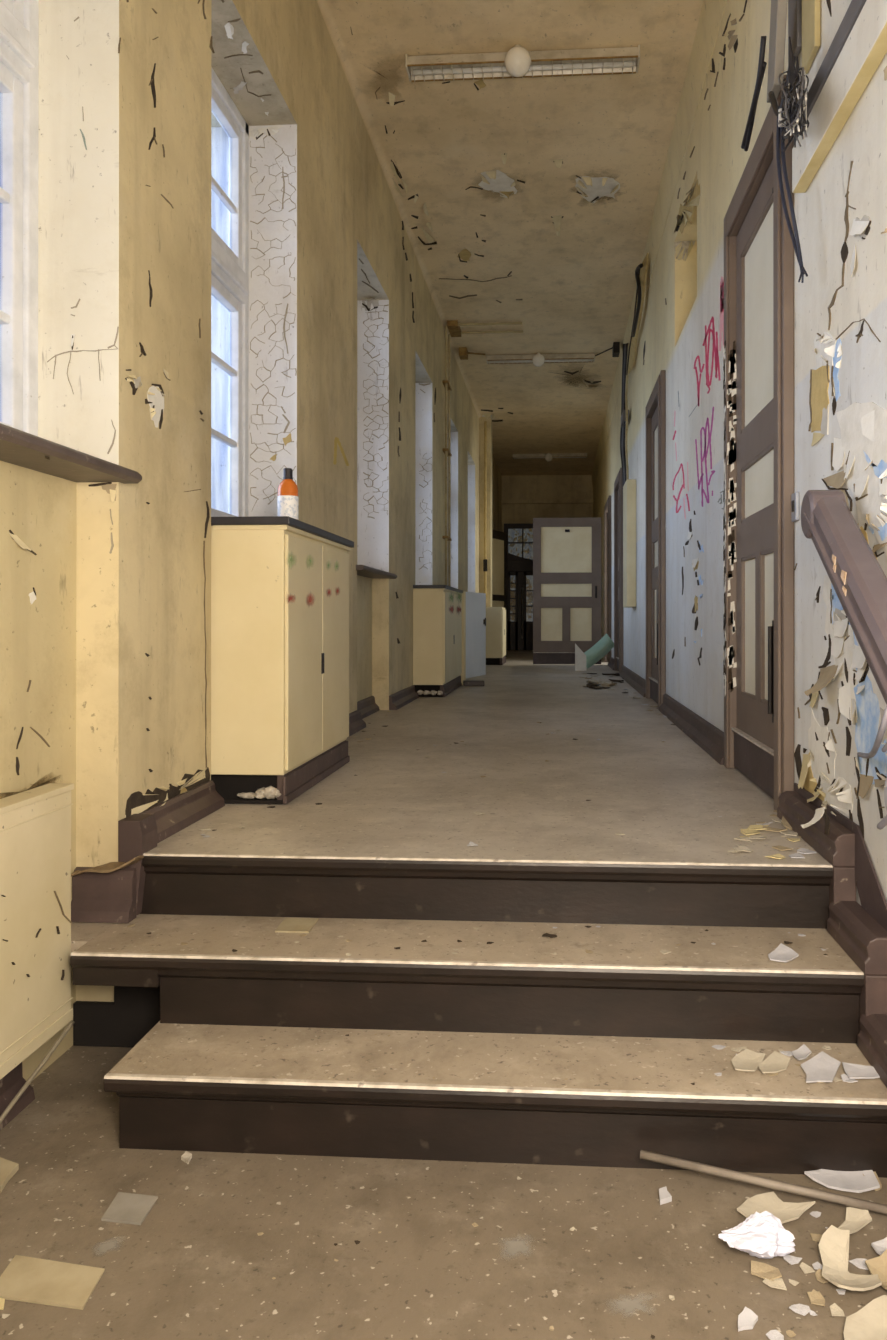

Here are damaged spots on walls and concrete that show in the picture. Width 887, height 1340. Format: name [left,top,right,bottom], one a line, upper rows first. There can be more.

crack [118,0,165,157]
peeling [704,0,747,100]
crack [146,270,154,307]
crack [439,271,522,303]
spalling [674,180,700,261]
crack [828,161,881,343]
crack [47,327,146,394]
peeling [125,369,170,429]
peeling [808,332,887,559]
peeling [685,511,704,666]
peeling [728,575,887,859]
spalling [125,767,210,818]